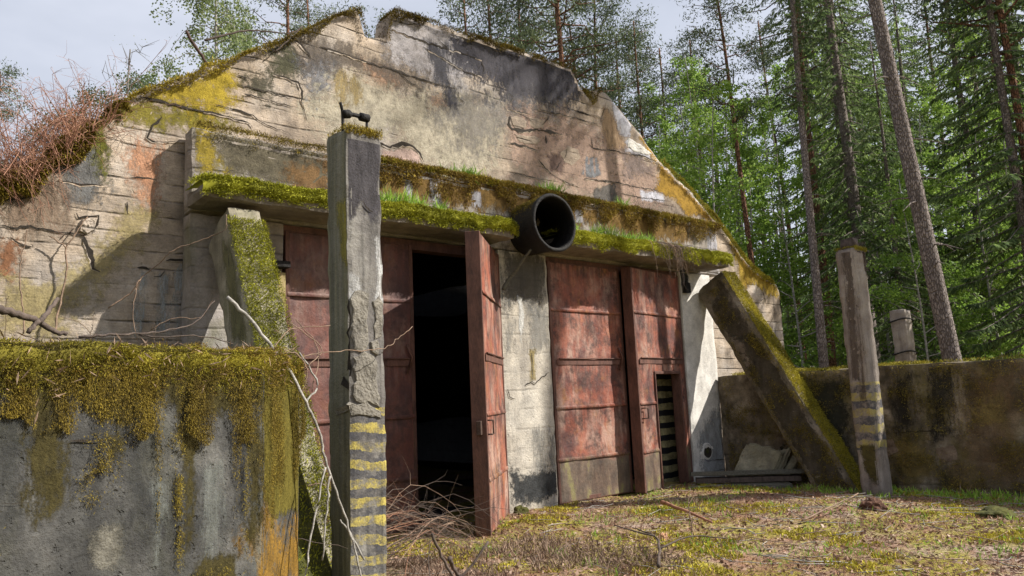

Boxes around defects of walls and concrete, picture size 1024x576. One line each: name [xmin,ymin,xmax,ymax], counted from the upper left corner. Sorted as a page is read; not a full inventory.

crack [0,197,100,273]
crack [380,141,424,164]
damp [292,34,717,250]
crack [506,109,690,240]
spalling [335,290,383,418]